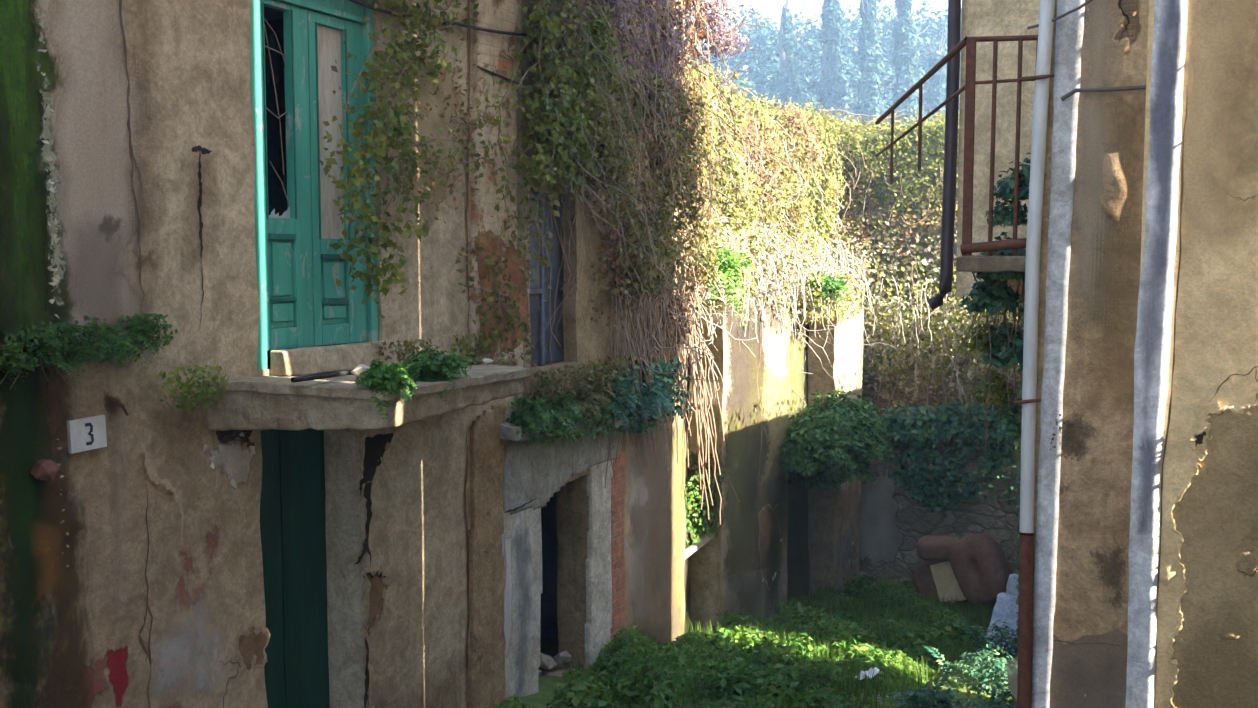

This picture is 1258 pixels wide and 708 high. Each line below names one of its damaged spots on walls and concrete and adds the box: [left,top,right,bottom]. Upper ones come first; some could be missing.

peeling [1110,0,1144,53]
crack [119,0,145,313]
crack [192,145,211,333]
spalling [468,179,531,354]
water stain [0,0,142,708]
crack [1209,366,1258,402]
spalling [203,430,257,488]
crack [354,434,391,579]
peeling [1166,403,1258,708]
spalling [234,622,270,674]
crack [362,637,370,708]